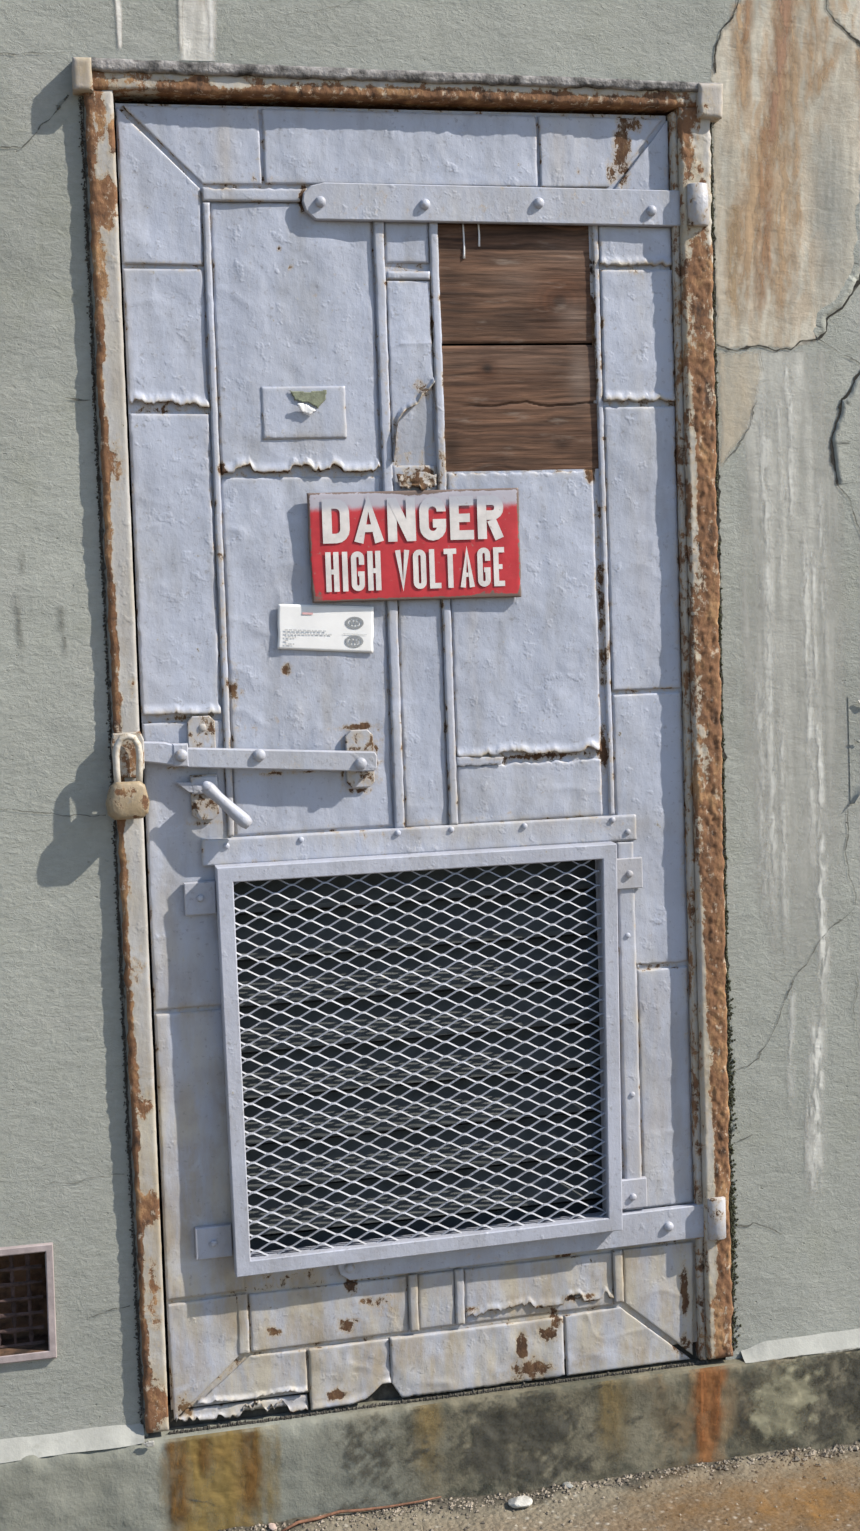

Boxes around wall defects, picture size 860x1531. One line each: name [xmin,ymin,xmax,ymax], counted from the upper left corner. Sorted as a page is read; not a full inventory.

damp [179,0,216,61]
crack [713,0,739,73]
crack [826,0,860,45]
crack [0,94,68,148]
crack [717,174,860,529]
damp [742,351,841,1188]
crack [737,809,859,1070]
rust [168,1427,272,1531]
damp [345,1383,616,1497]
rust [684,1365,728,1464]